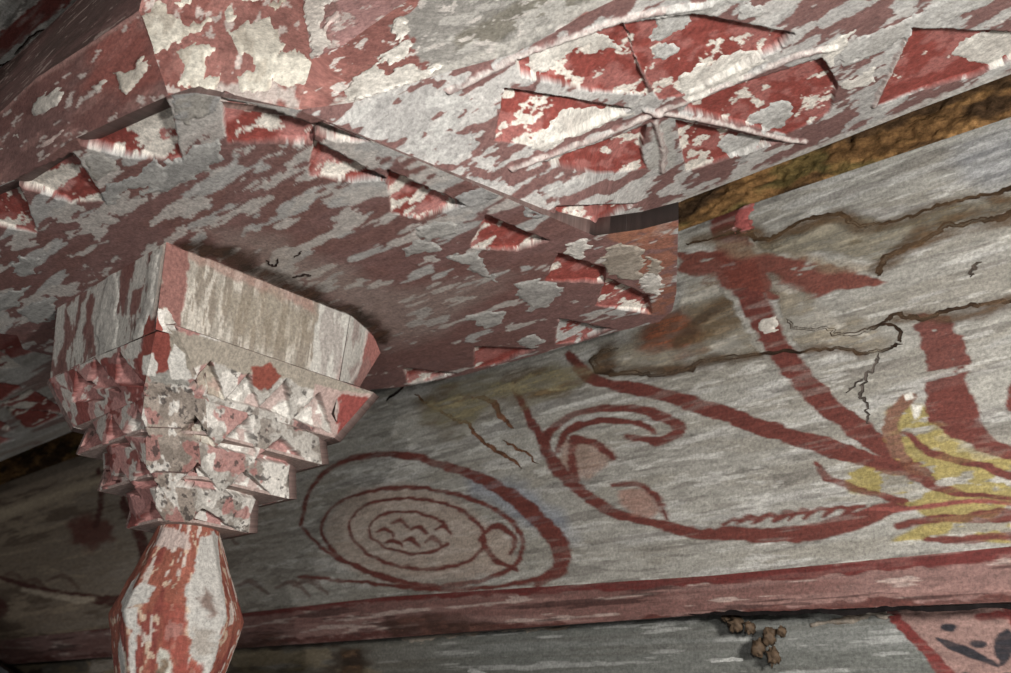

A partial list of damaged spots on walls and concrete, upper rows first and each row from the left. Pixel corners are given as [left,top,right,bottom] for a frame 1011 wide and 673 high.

peeling [91,0,224,126]
peeling [225,0,339,93]
peeling [344,8,444,101]
peeling [649,0,765,60]
peeling [676,50,769,103]
peeling [821,0,994,90]
peeling [952,30,1011,69]
peeling [531,105,636,151]
peeling [717,100,794,158]
damp [694,194,1011,270]
peeling [600,243,666,299]
crack [589,298,1011,424]